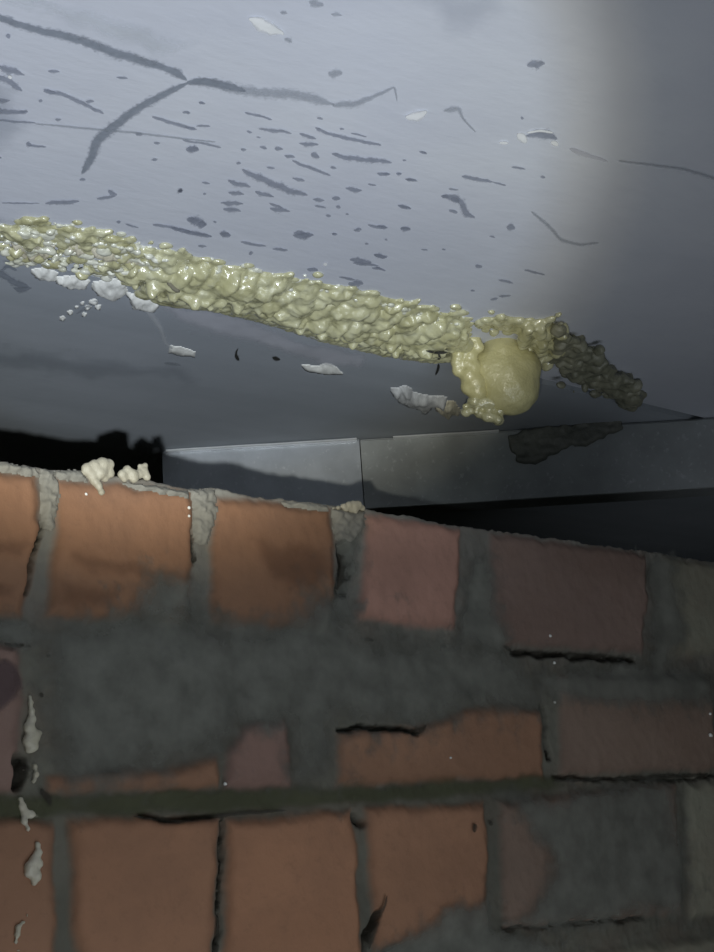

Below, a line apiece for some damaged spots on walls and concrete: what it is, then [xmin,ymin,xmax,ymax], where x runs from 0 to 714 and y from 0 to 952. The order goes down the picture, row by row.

crack [0,15,245,173]
crack [134,810,286,952]
crack [364,896,387,949]